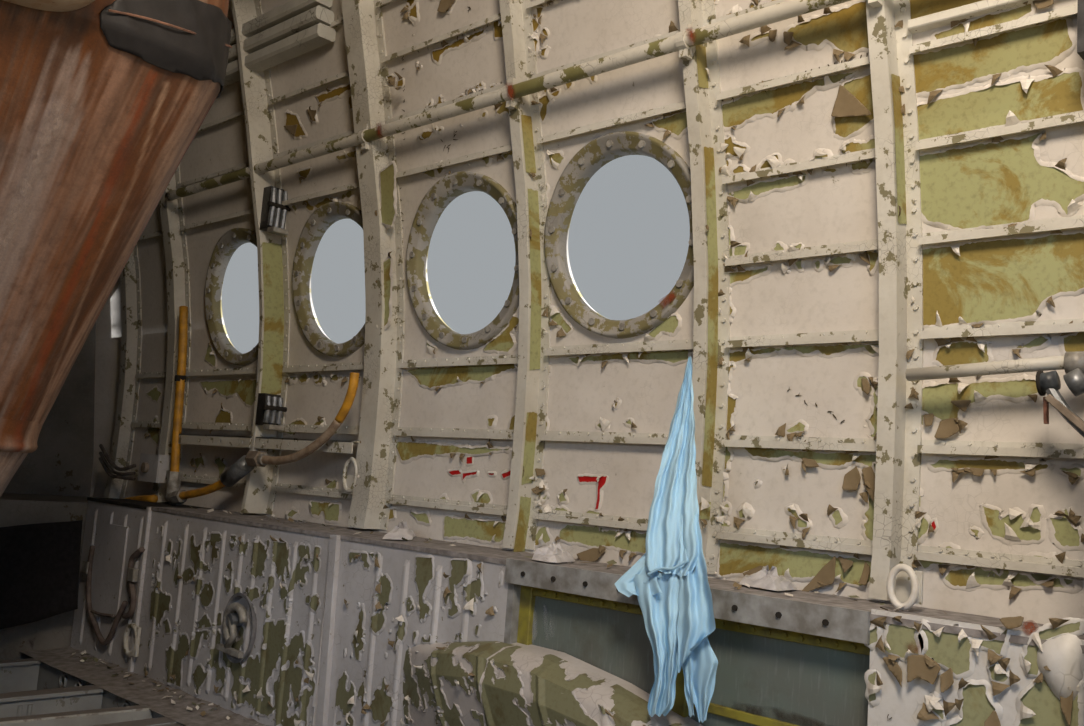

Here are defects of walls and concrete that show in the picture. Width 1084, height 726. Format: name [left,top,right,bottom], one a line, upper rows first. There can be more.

peeling [416,19,503,70]
peeling [645,107,688,140]
peeling [375,161,397,228]
peeling [403,75,598,392]
peeling [891,0,1084,440]
peeling [566,313,692,369]
peeling [700,0,879,601]
peeling [926,455,1084,485]
peeling [71,525,322,726]
peeling [333,412,685,726]
peeling [864,603,1084,726]
peeling [912,503,1084,599]